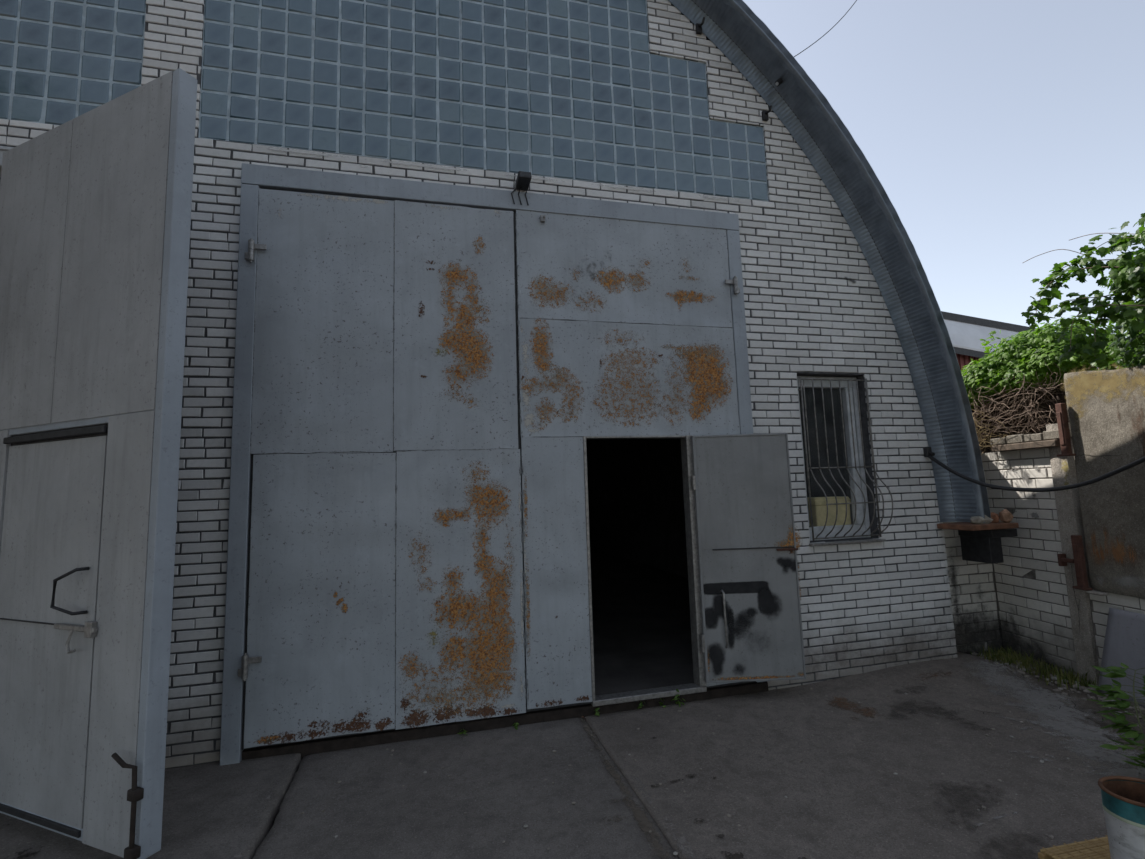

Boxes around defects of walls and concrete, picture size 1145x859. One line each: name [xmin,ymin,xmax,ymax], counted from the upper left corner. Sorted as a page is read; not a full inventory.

rust [426,260,494,408]
rust [520,259,733,430]
rust [253,461,531,745]